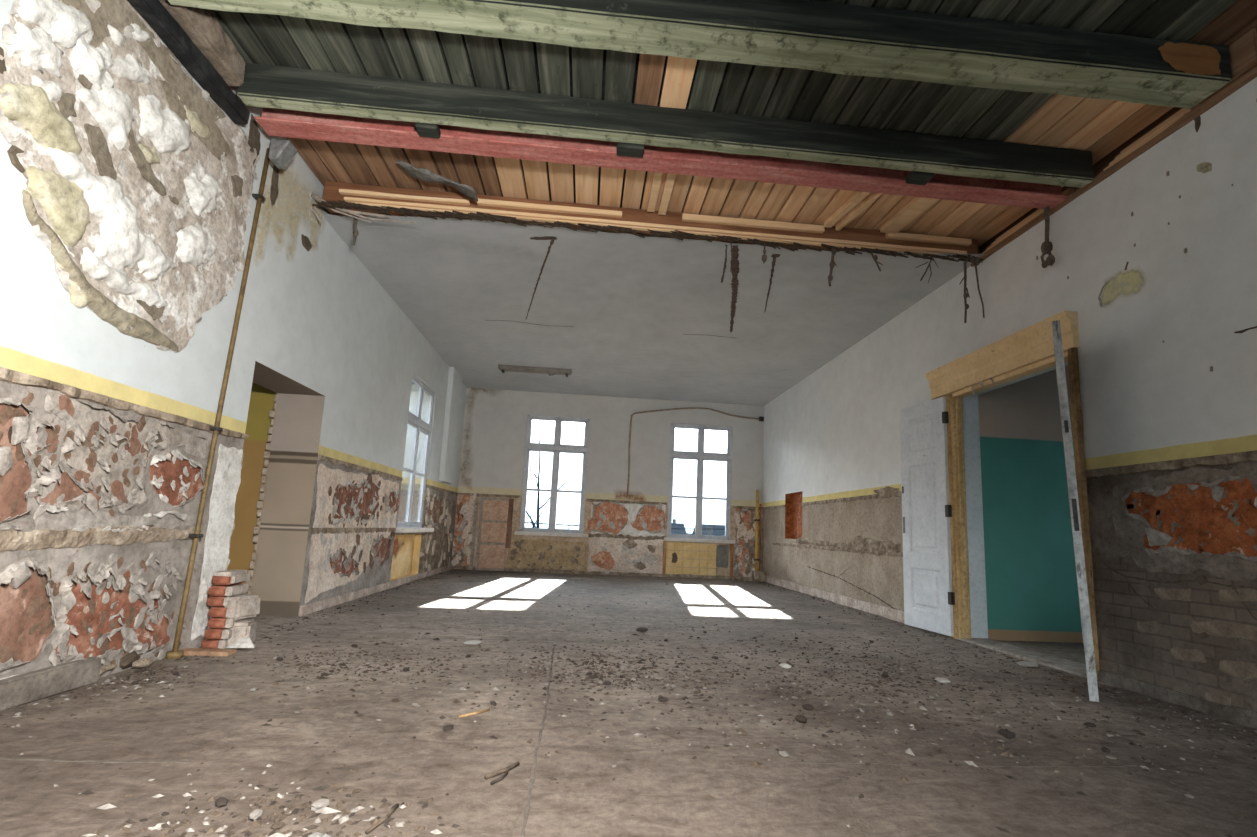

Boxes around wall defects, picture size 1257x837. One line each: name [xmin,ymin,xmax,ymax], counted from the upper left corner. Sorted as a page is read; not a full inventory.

peeling [0,0,260,353]
peeling [0,551,202,680]
peeling [0,392,208,534]
peeling [197,580,207,605]
peeling [304,464,399,604]
flaking render [506,501,667,571]
flaking render [794,535,900,556]
flaking render [1122,475,1257,562]